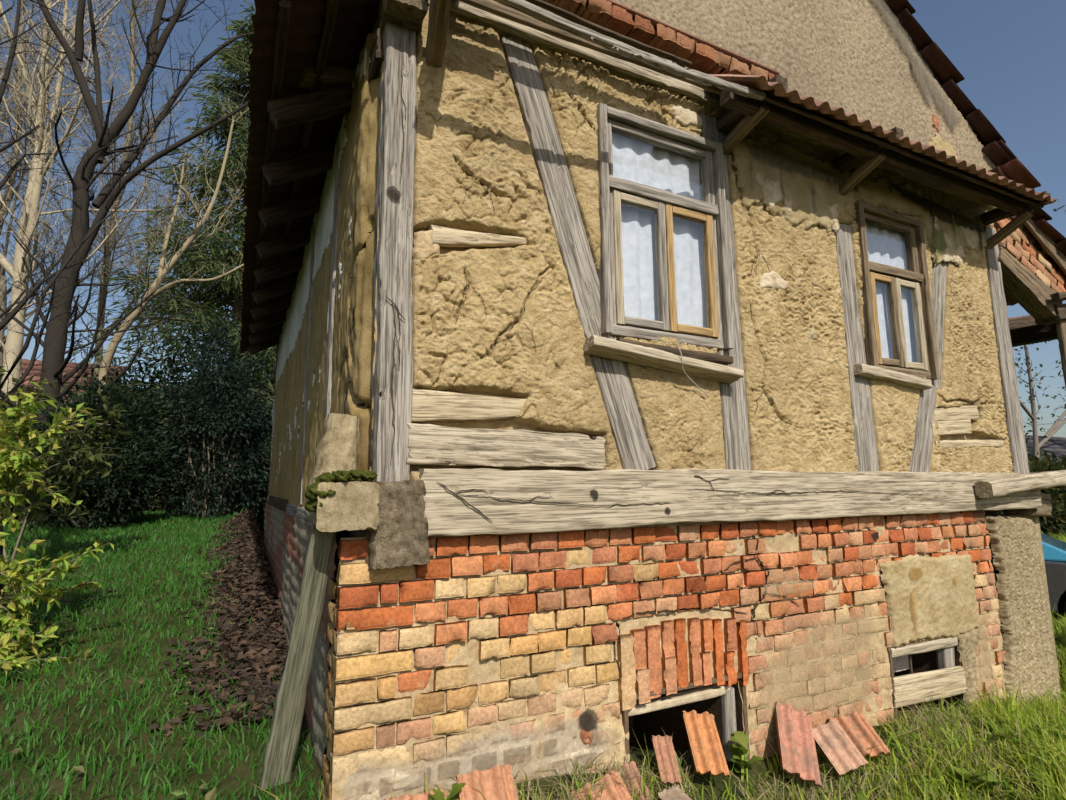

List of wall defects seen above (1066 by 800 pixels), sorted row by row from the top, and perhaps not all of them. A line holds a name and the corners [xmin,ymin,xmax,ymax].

peeling [352,49,371,88]
crack [452,154,513,211]
peeling [276,115,348,385]
crack [453,272,545,358]
crack [749,300,802,428]
peeling [271,365,321,484]
crack [438,482,665,523]